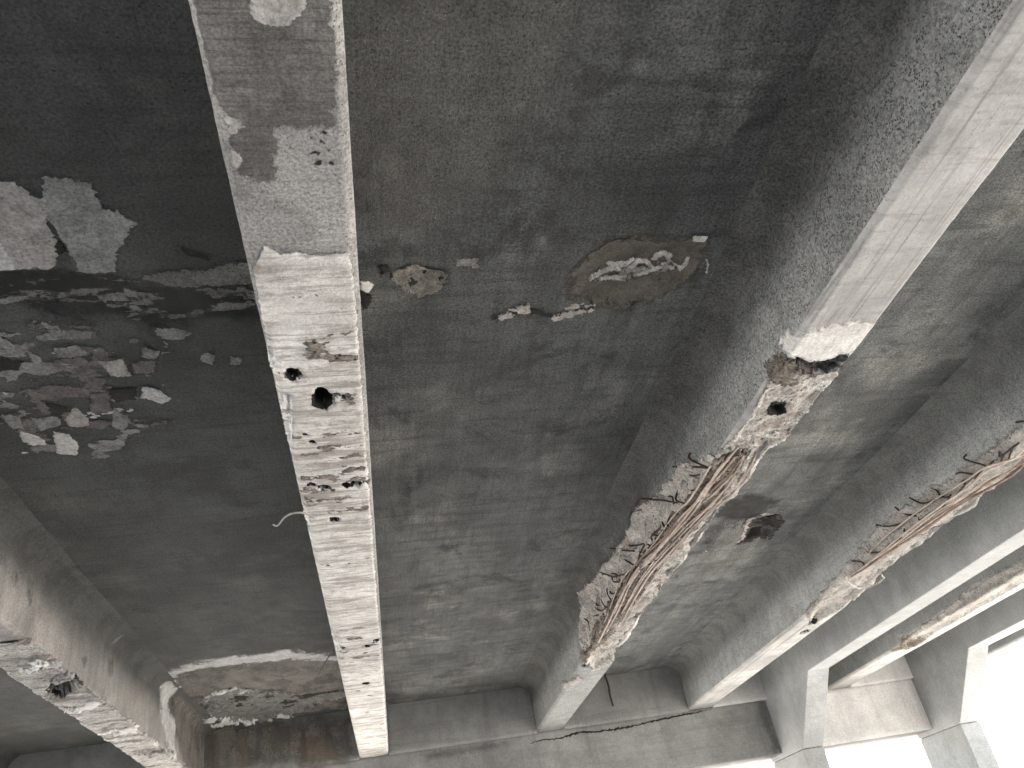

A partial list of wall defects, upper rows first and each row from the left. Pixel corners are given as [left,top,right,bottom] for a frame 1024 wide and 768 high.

spalling [564,234,710,312]
spalling [0,176,480,768]
corrosion [579,449,751,664]
spalling [562,318,878,706]
spalling [800,420,1024,634]
spalling [891,558,1024,652]
crack [531,709,711,744]